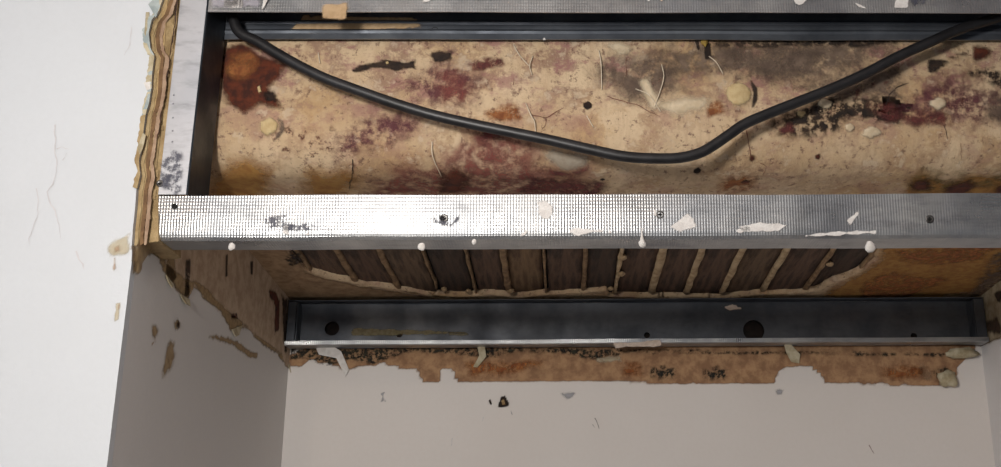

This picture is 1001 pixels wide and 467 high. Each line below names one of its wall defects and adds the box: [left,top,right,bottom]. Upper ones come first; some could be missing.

peeling [144,0,160,36]
leakage [410,65,474,102]
mould [806,66,900,102]
mould [895,69,1001,126]
leakage [210,161,269,196]
leakage [301,113,416,195]
leakage [375,131,604,195]